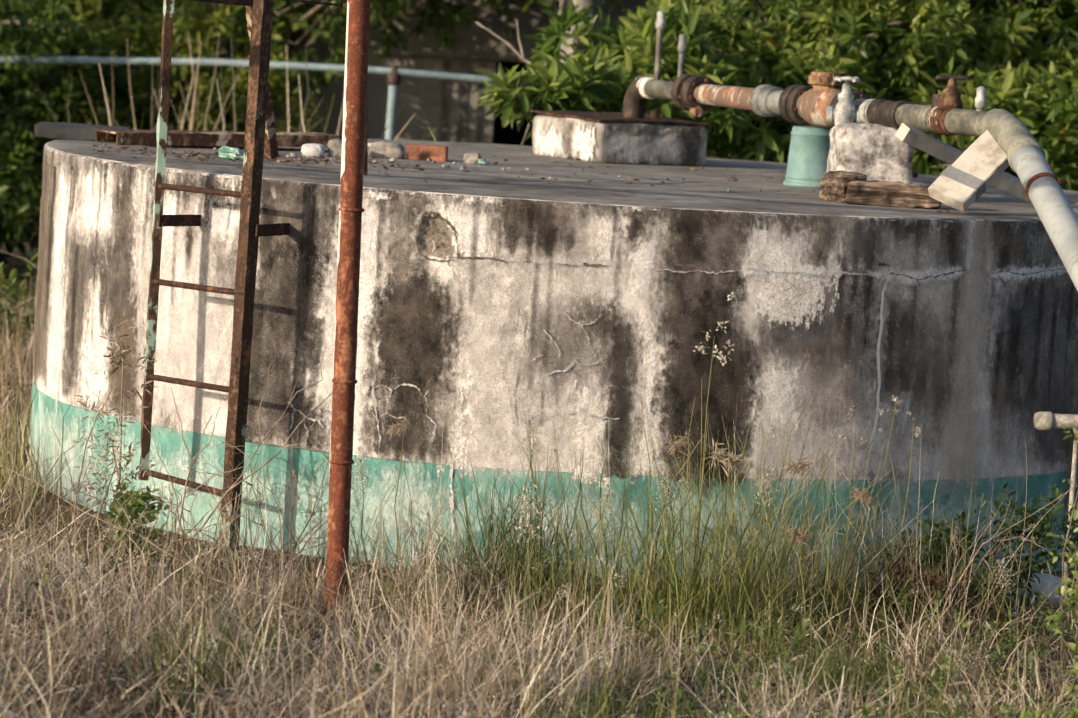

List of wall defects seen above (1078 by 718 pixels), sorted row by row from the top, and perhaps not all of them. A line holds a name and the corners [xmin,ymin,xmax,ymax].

damp [33,150,242,414]
damp [245,179,341,450]
peeling [364,193,676,546]
damp [358,188,1078,490]
crack [651,261,962,444]
crack [990,264,1067,281]